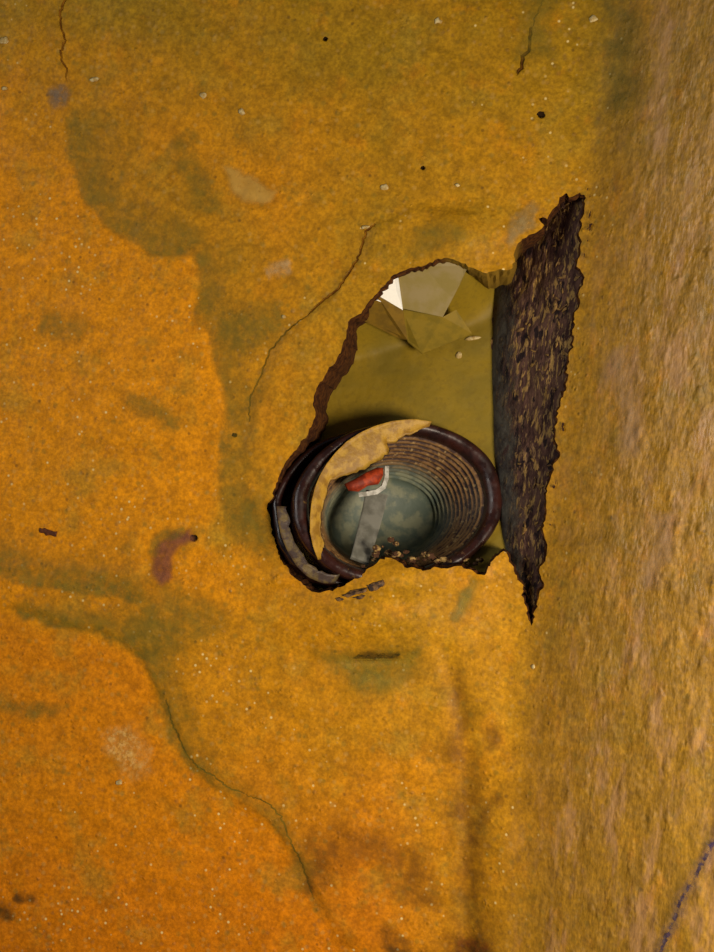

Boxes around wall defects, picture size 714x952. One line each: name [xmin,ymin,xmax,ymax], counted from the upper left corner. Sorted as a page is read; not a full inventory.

crack [59,0,68,81]
crack [517,0,543,74]
crack [248,224,375,422]
spalling [267,188,595,625]
crack [659,842,714,952]